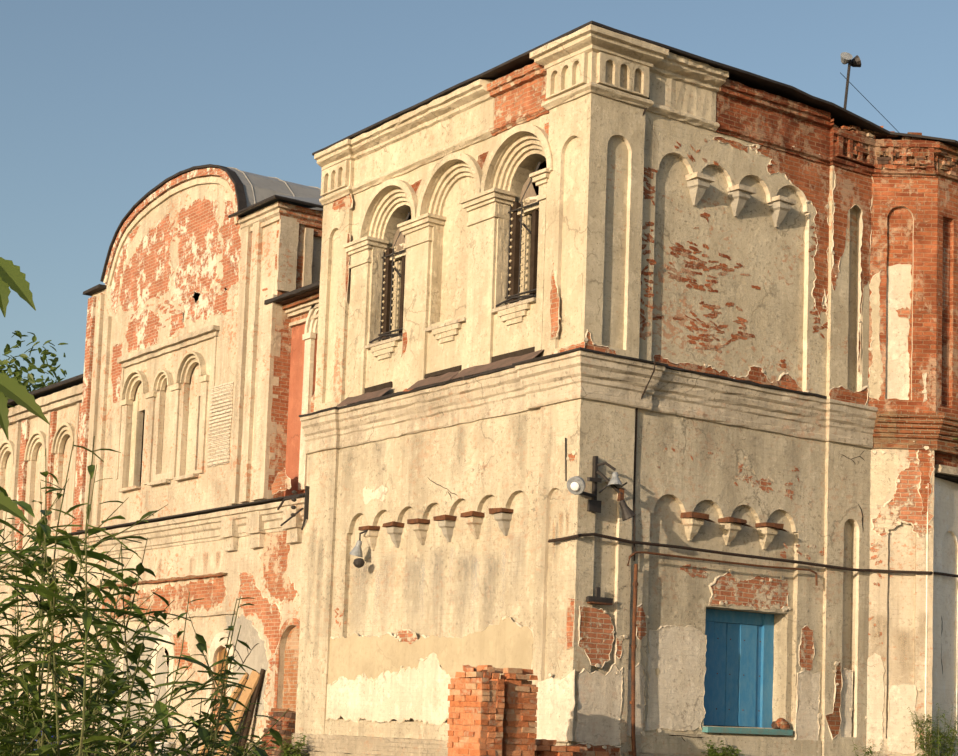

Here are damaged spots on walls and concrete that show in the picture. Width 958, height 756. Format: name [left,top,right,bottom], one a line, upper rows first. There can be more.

flaking render [643,167,658,206]
flaking render [110,196,252,404]
flaking render [550,261,617,355]
flaking render [639,221,761,353]
flaking render [652,125,958,405]
flaking render [870,441,935,586]
flaking render [98,530,299,736]
flaking render [325,598,707,756]
flaking render [680,564,791,612]
flaking render [794,625,853,753]
flaking render [865,616,921,756]